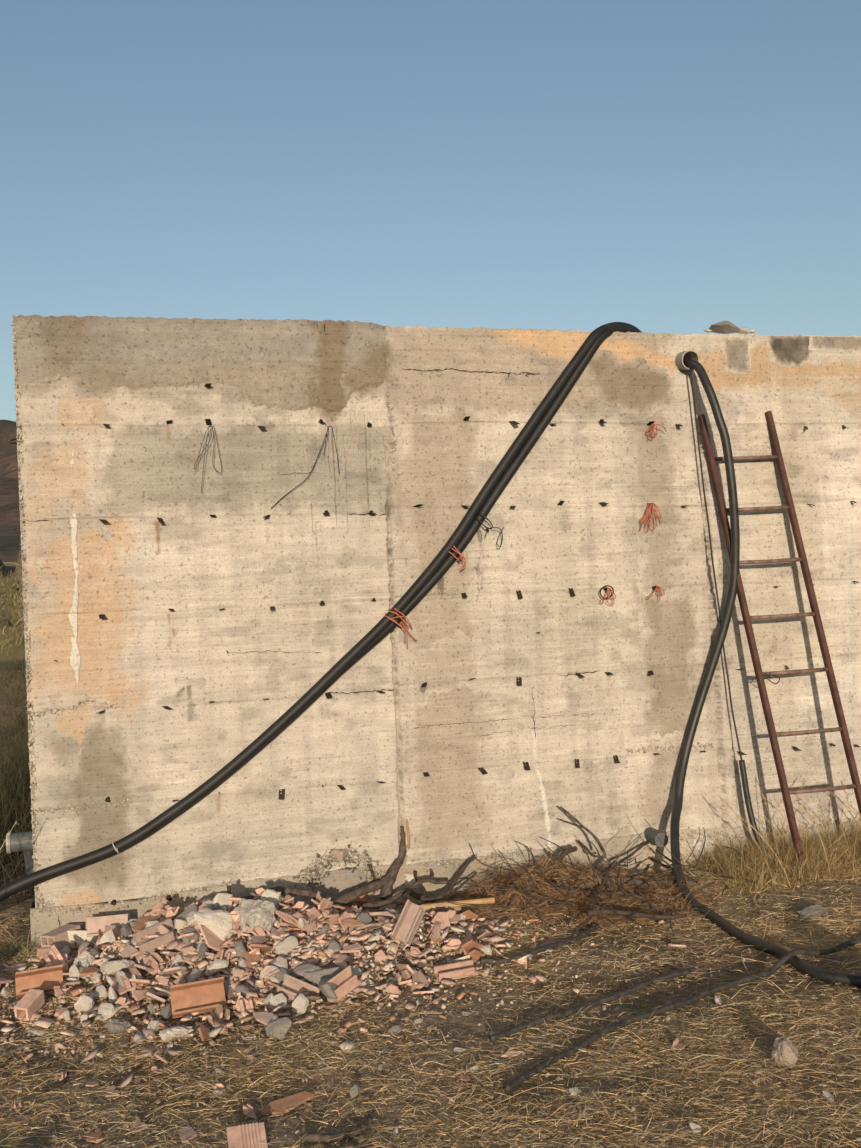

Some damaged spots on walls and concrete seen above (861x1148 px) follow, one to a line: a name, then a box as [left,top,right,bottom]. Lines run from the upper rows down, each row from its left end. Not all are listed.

leakage [13,316,155,917]
leakage [287,320,486,602]
leakage [397,516,503,890]